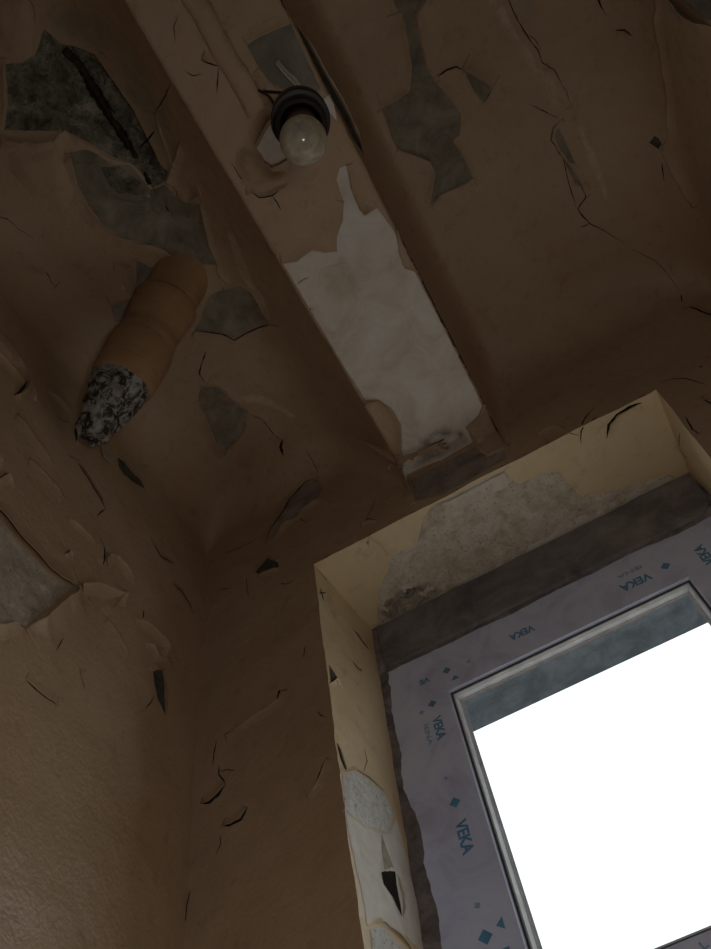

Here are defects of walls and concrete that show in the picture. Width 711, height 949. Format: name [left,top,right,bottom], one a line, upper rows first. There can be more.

spalling [0,29,187,190]
peeling [244,109,292,172]
peeling [242,15,367,160]
crack [501,0,711,315]
peeling [279,163,675,626]
crack [536,403,642,441]
peeling [0,501,129,648]
peeling [340,766,423,949]